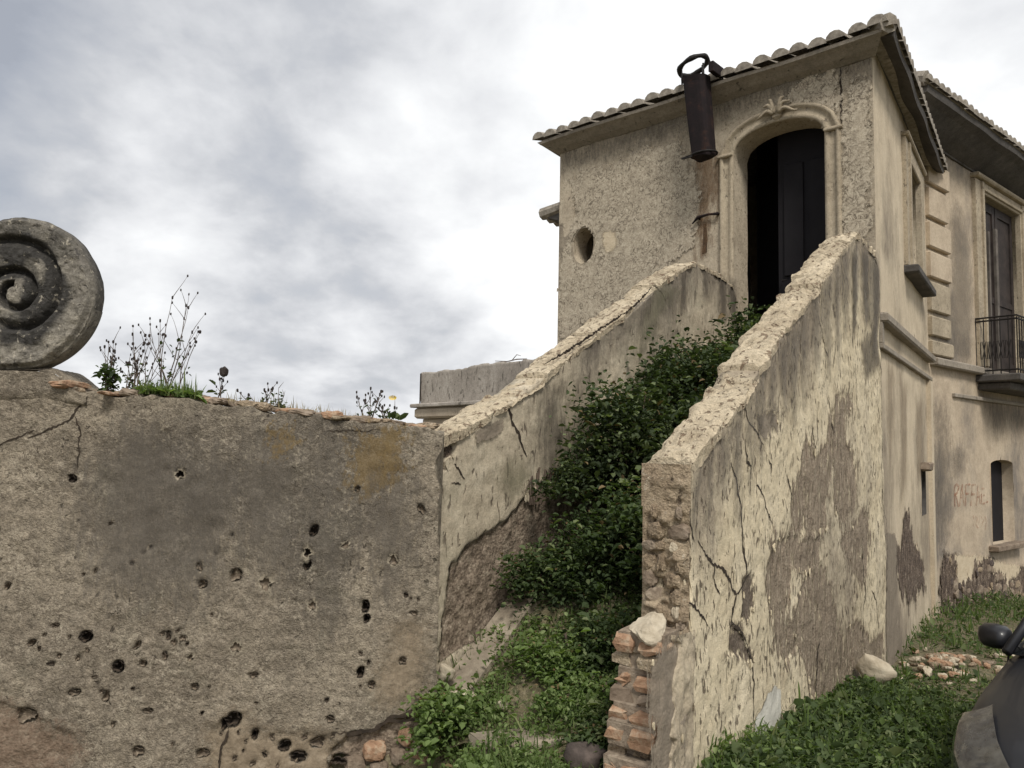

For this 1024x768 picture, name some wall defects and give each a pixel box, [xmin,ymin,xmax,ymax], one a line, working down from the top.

crack [0,405,82,467]
crack [508,408,527,457]
spalling [438,471,587,663]
crack [689,406,794,731]
peeling [724,388,885,699]
spalling [896,511,1024,613]